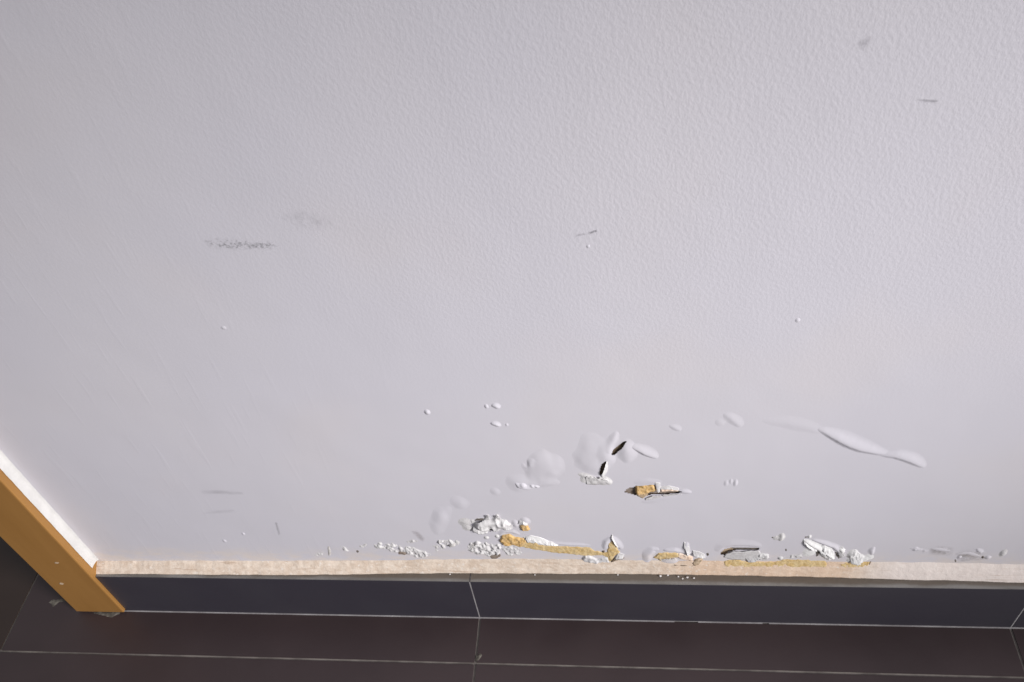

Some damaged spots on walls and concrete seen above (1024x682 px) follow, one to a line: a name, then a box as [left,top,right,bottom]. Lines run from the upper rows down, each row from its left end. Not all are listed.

spalling [625,478,692,503]
flaking render [96,514,1024,583]